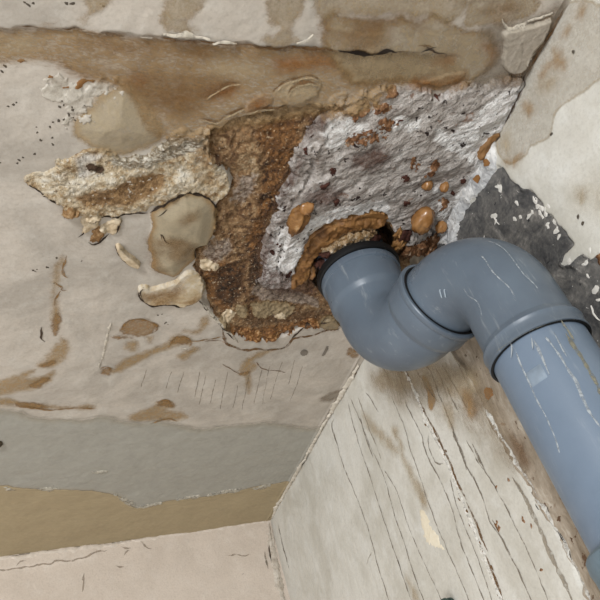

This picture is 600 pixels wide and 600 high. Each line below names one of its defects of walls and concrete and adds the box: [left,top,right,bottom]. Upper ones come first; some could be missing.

crack [140,30,404,57]
peeling [501,12,553,74]
spalling [24,103,340,343]
water stain [0,0,600,292]
spalling [338,221,395,246]
peeling [456,167,600,348]
flaking render [0,481,292,557]
crack [393,366,548,600]
crack [486,410,591,600]